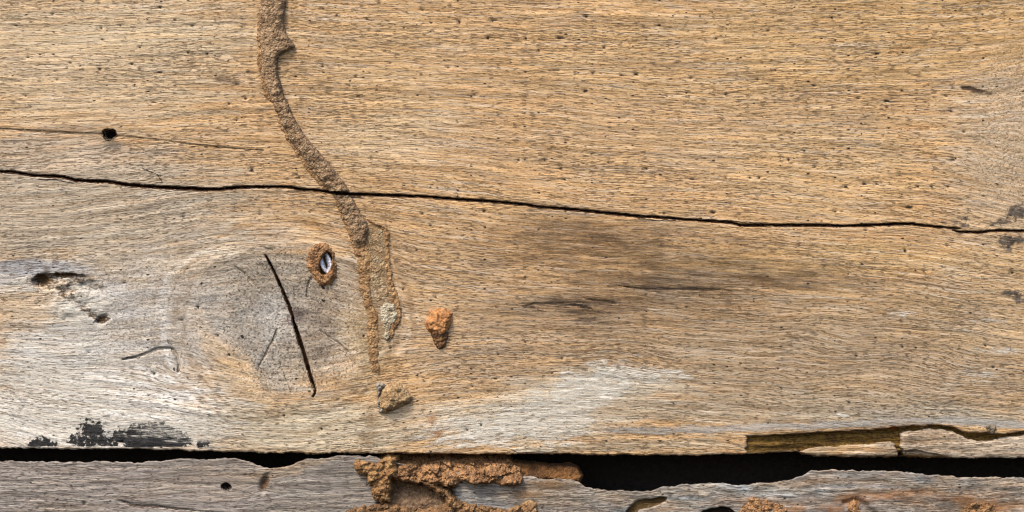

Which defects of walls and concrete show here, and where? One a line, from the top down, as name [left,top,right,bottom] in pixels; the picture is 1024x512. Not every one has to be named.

crack [0,168,1024,234]
crack [237,255,355,397]
damp [0,364,250,448]
spalling [745,425,1024,452]